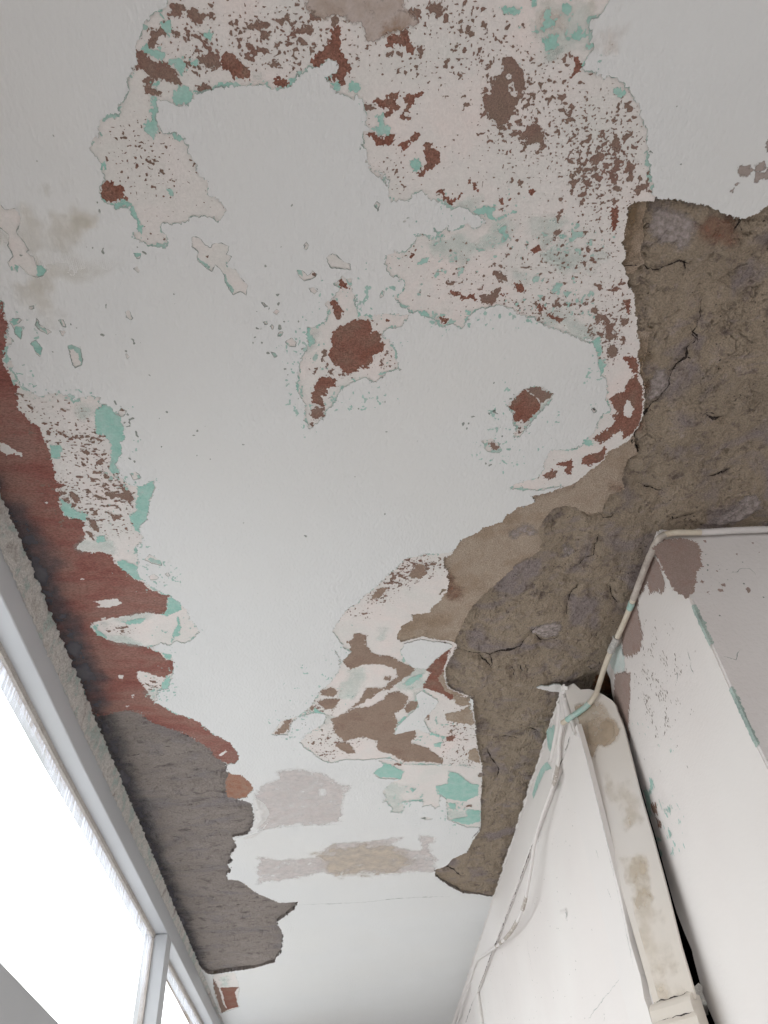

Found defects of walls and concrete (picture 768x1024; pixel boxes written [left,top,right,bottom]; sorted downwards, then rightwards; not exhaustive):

spalling [0,298,295,1024]
spalling [90,0,768,895]
water stain [575,704,619,756]
crack [631,299,702,452]